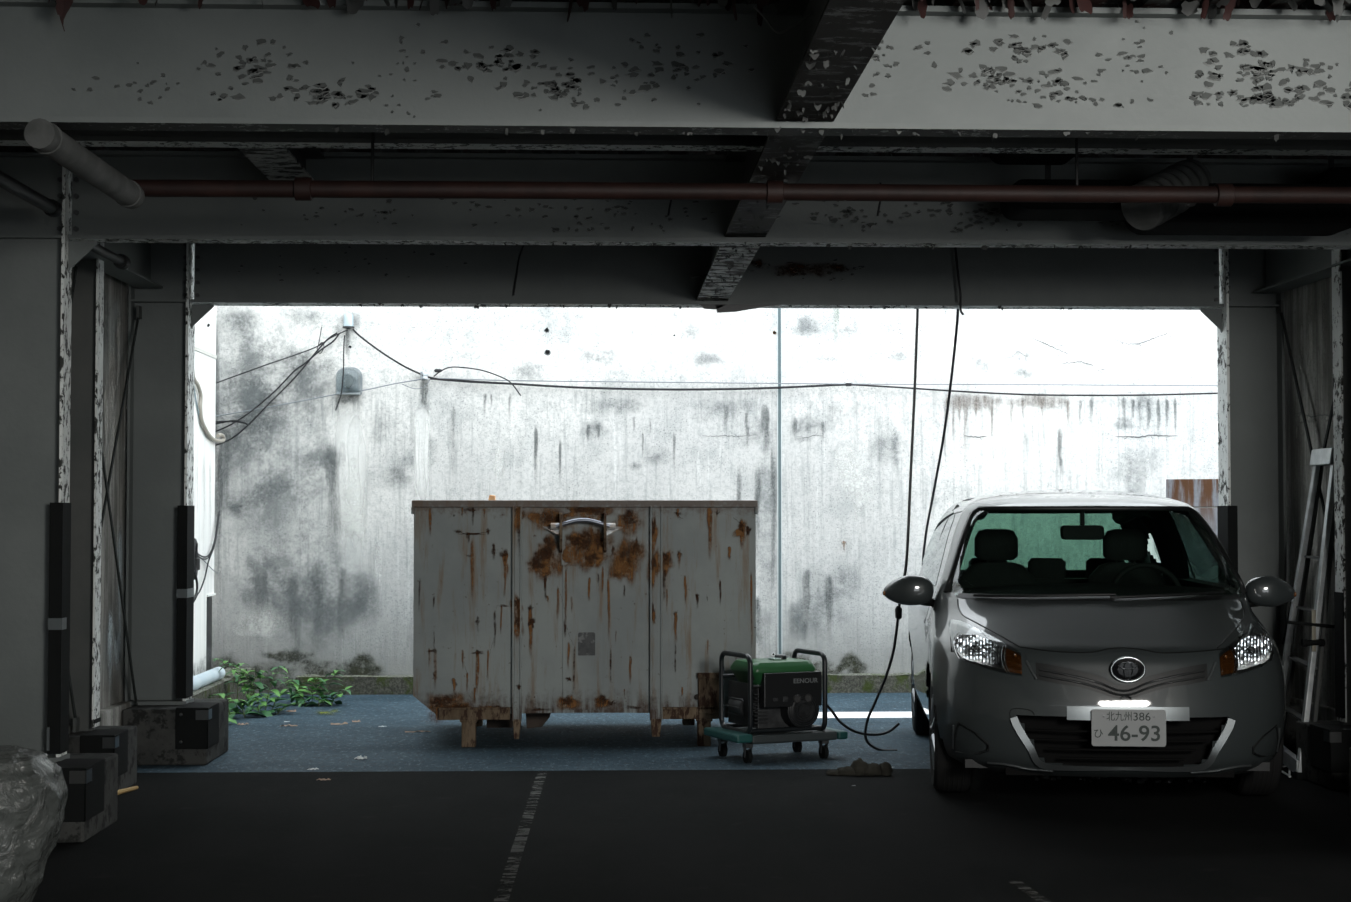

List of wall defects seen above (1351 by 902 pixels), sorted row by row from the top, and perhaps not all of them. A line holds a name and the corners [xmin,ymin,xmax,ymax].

peeling [196,33,754,135]
peeling [912,0,1169,109]
peeling [1189,39,1351,111]
damp [400,383,430,496]
damp [324,402,381,606]